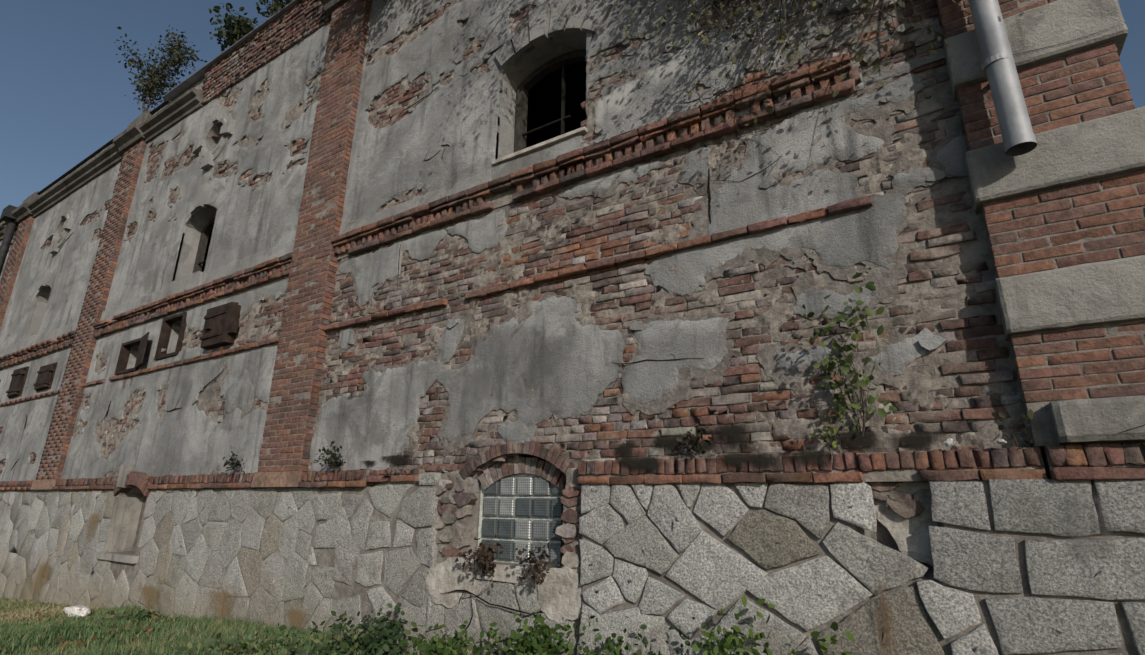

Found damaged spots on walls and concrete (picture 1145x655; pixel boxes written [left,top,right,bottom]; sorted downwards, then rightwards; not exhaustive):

flaking render [209,70,322,191]
flaking render [123,133,218,243]
crack [703,144,780,224]
flaking render [233,289,286,348]
flaking render [312,0,1033,624]
flaking render [74,381,170,459]
flaking render [191,362,229,424]